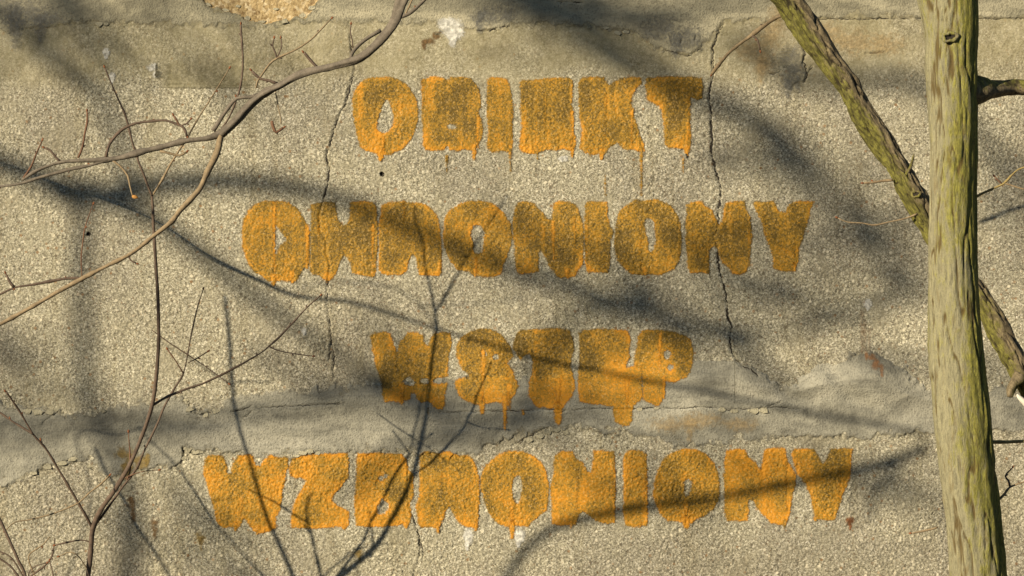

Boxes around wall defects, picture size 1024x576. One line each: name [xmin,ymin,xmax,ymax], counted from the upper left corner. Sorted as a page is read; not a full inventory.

crack [323,37,355,199]
crack [667,26,758,376]
crack [326,281,335,368]